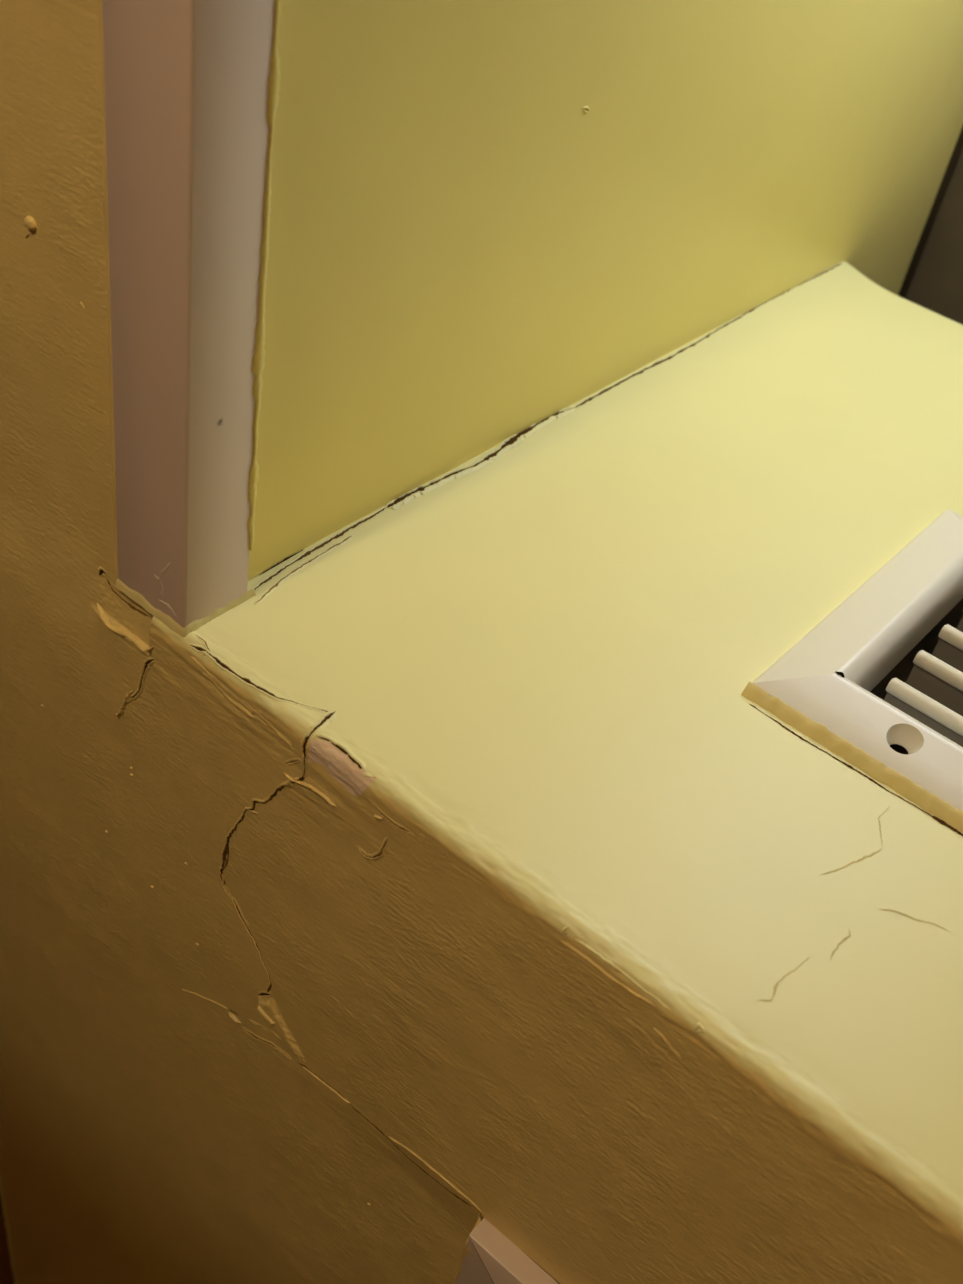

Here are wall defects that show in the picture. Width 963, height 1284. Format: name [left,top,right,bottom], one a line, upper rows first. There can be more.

crack [247,263,842,605]
spalling [96,566,154,654]
crack [116,657,155,716]
crack [190,620,337,998]
peeling [279,774,336,806]
spalling [308,733,427,838]
crack [357,815,390,861]
crack [750,704,963,874]
crack [881,909,948,931]
crack [181,989,228,1009]
crack [755,930,851,1001]
crack [297,1062,482,1212]